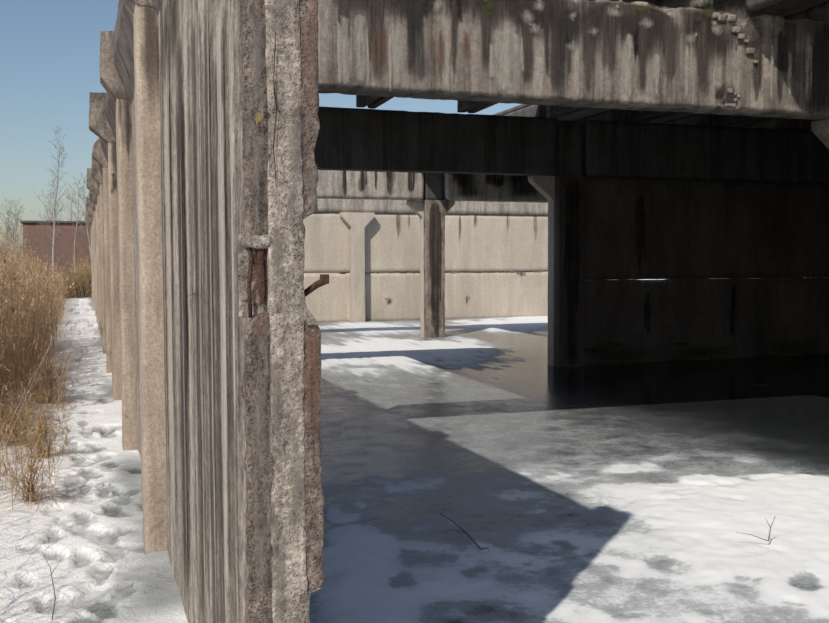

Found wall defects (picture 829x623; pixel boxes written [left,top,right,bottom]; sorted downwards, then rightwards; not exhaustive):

crack [269,31,281,188]
leakage [337,0,675,96]
leakage [685,9,731,95]
leakage [744,17,829,116]